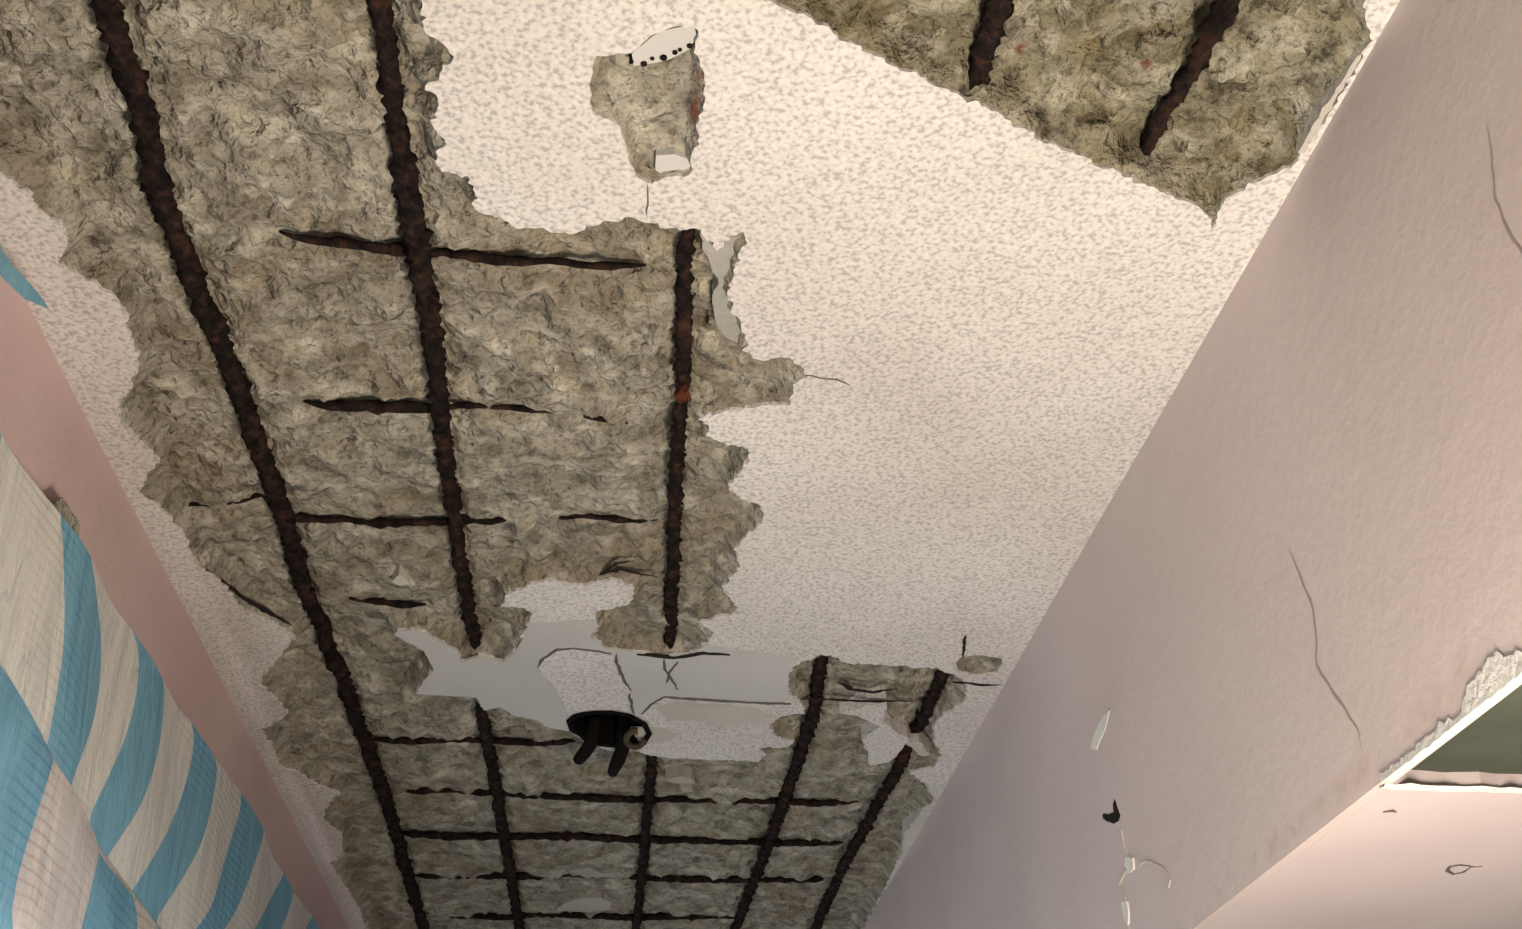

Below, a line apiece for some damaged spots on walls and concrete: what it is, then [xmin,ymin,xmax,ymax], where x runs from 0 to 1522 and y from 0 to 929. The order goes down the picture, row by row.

corrosion [691,73,701,121]
spalling [775,0,1373,223]
crack [1486,125,1522,254]
spalling [0,0,1002,929]
crack [1289,548,1363,753]
flaking render [1380,650,1522,783]